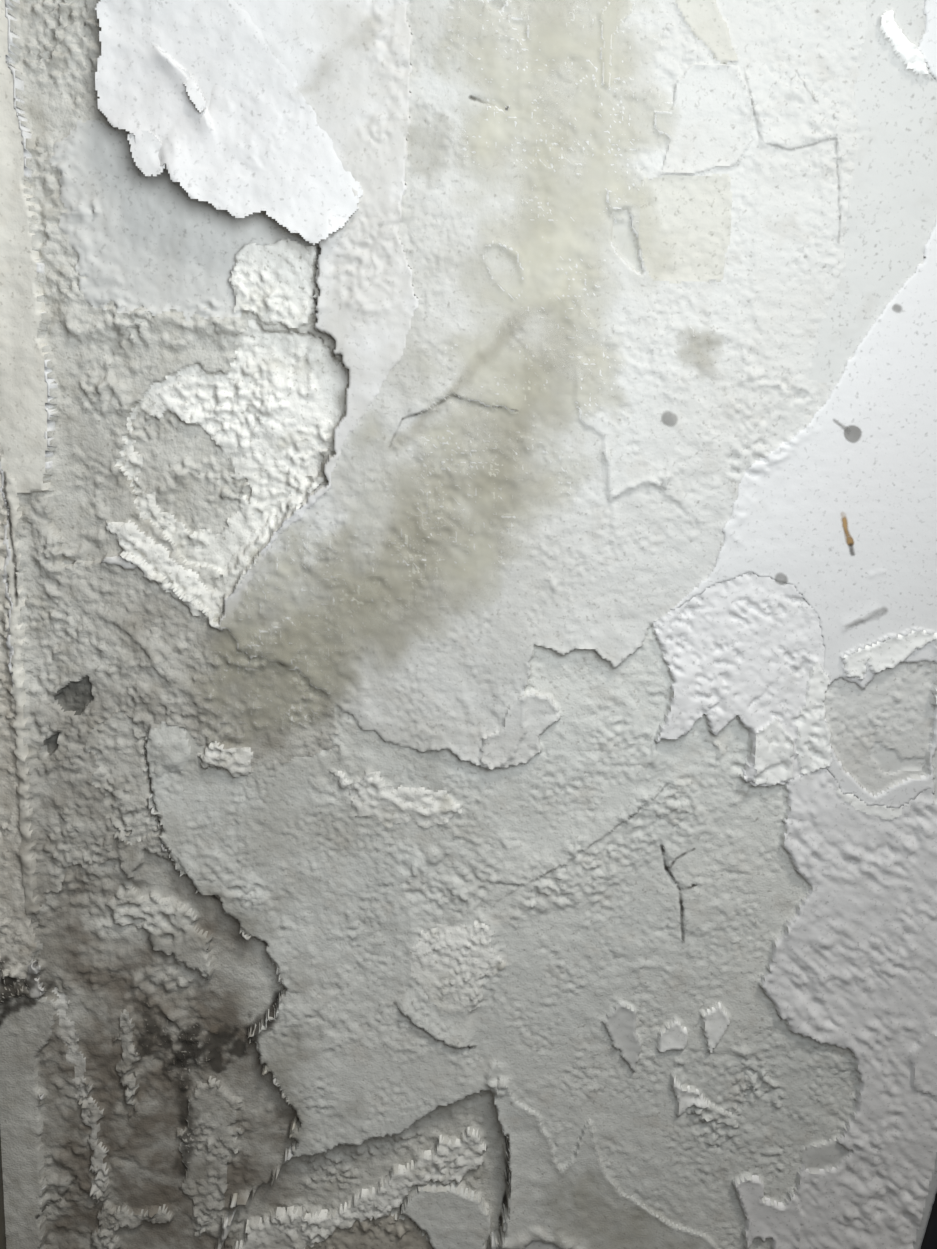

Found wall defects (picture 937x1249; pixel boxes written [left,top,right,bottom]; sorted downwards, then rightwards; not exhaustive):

leakage [468,0,644,328]
leakage [333,420,524,634]
peeling [7,0,937,907]
leakage [466,334,594,435]
leakage [258,606,329,720]
peeling [29,624,862,1249]
crack [661,845,696,940]
leakage [135,992,281,1176]